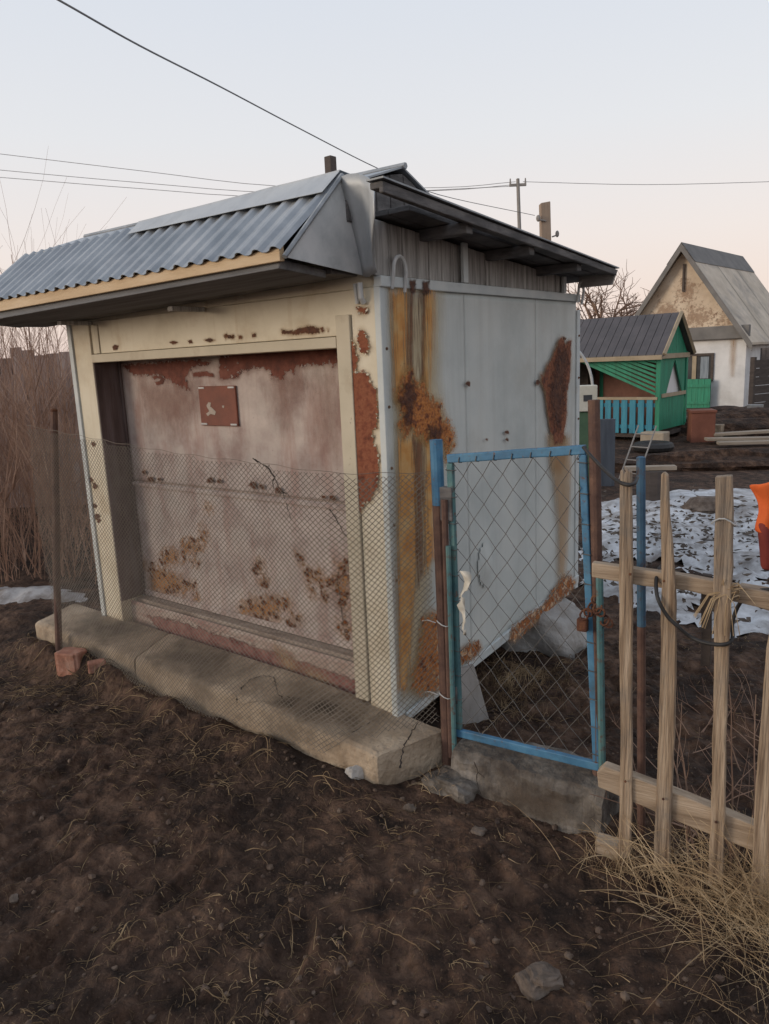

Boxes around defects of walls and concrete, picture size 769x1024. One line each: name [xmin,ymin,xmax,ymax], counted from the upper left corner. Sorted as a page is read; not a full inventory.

peeling [121,349,338,391]
corrosion [393,365,458,463]
corrosion [536,336,572,445]
corrosion [148,525,206,600]
corrosion [239,560,301,628]
corrosion [295,553,351,641]
corrosion [509,571,576,642]
corrosion [411,611,440,699]
corrosion [460,639,481,666]
crack [399,719,421,768]